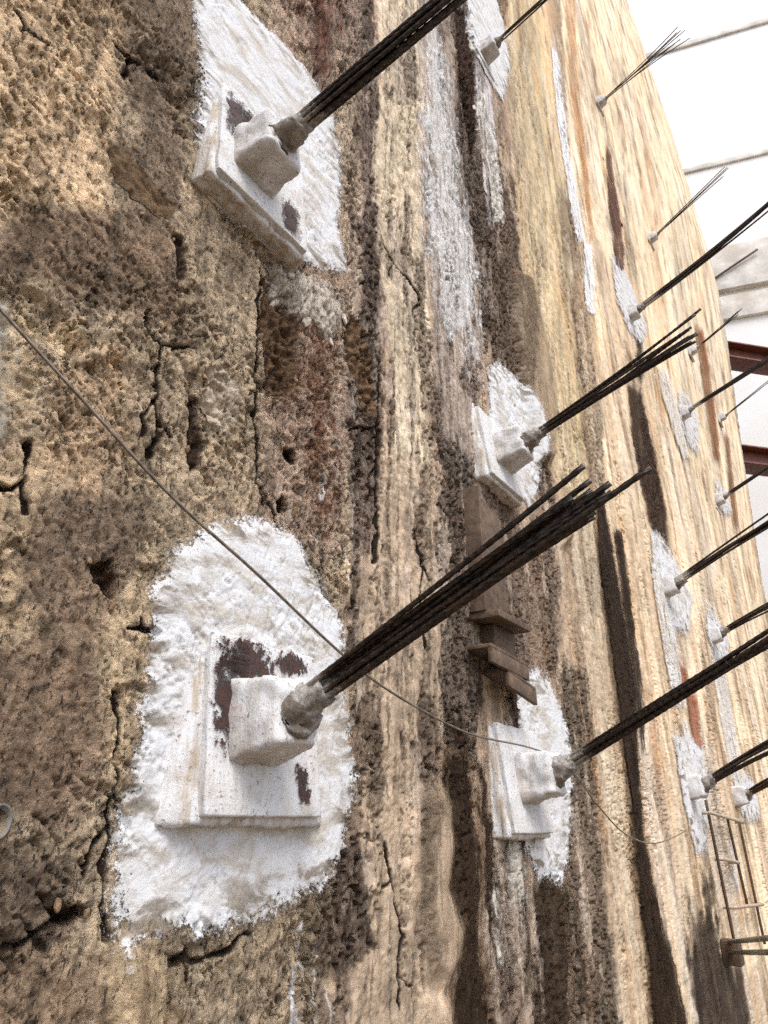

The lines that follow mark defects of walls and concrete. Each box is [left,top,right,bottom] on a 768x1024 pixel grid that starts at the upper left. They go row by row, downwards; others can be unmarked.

rust [224,90,254,138]
rust [282,193,302,238]
leakage [419,19,482,362]
crack [139,313,190,459]
crack [0,441,32,515]
rust [209,634,308,758]
rust [688,693,704,747]
crack [80,691,123,942]
rust [295,762,312,808]
crack [381,841,412,1009]